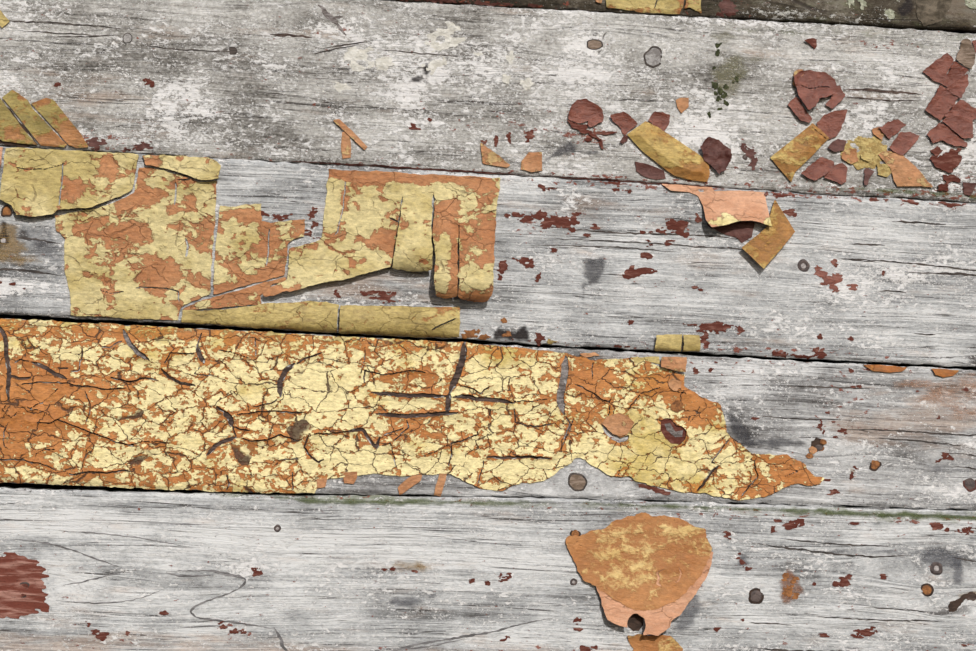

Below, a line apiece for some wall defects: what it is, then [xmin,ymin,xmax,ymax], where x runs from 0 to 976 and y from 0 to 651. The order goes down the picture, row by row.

peeling [596,0,702,14]
peeling [716,0,739,17]
peeling [770,39,976,208]
crack [0,268,61,276]
crack [15,236,60,244]
peeling [0,90,840,501]
crack [0,326,256,475]
peeling [565,512,713,651]